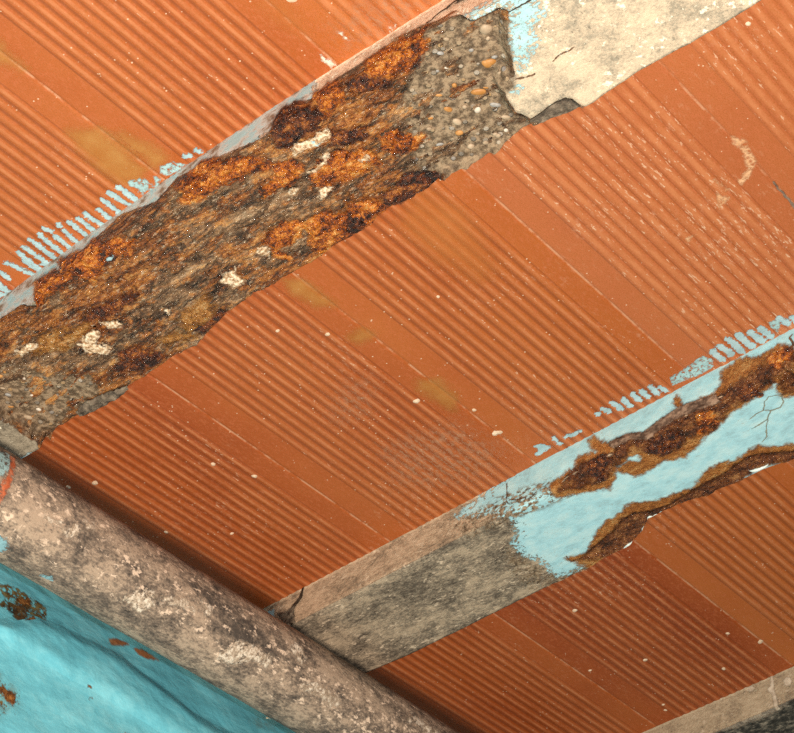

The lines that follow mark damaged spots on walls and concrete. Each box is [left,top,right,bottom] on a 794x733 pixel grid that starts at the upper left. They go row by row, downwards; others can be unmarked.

spalling [0,0,583,449]
peeling [454,329,794,590]
rust [0,684,16,713]
rust [0,584,47,620]